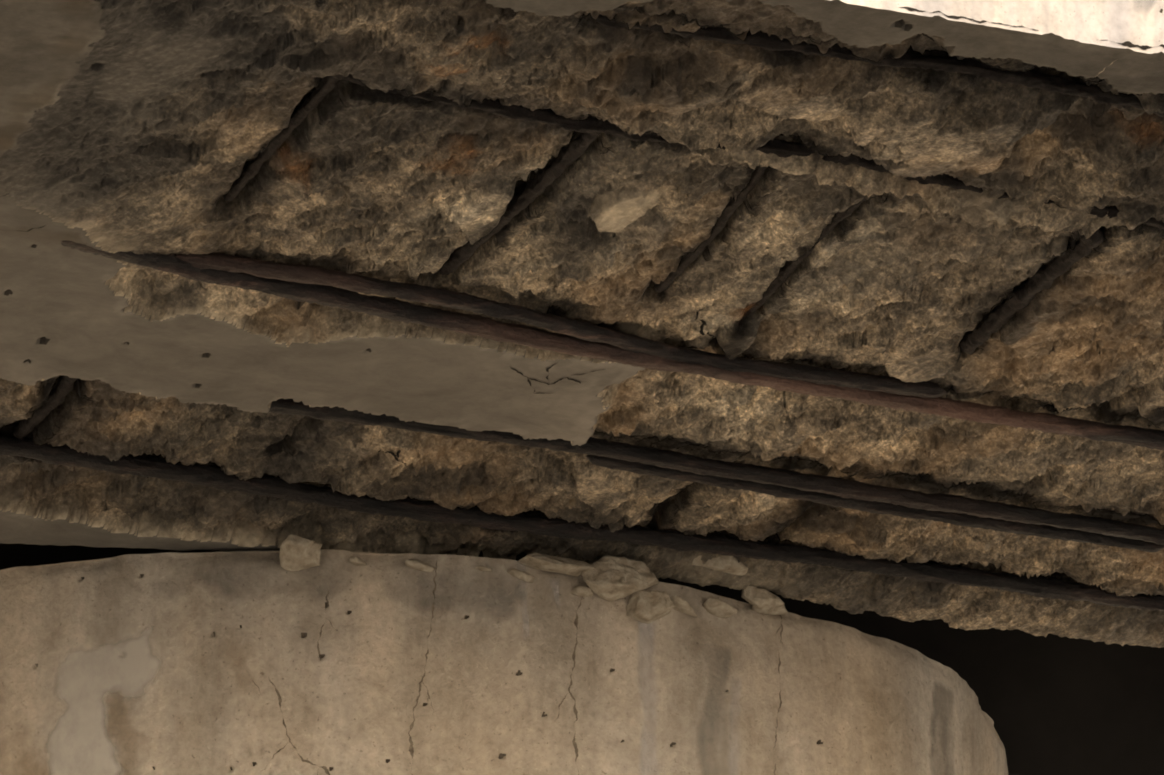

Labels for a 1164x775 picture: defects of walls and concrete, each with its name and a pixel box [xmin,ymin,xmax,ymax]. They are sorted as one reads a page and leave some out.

corrosion [214,77,498,204]
spalling [0,0,1164,431]
corrosion [679,210,855,360]
corrosion [1039,226,1113,269]
spalling [0,240,1164,648]
corrosion [593,430,703,452]
corrosion [625,482,789,544]
corrosion [756,455,1164,529]
corrosion [1035,400,1164,428]
corrosion [997,566,1092,586]
crack [408,562,437,775]
crack [247,671,330,775]